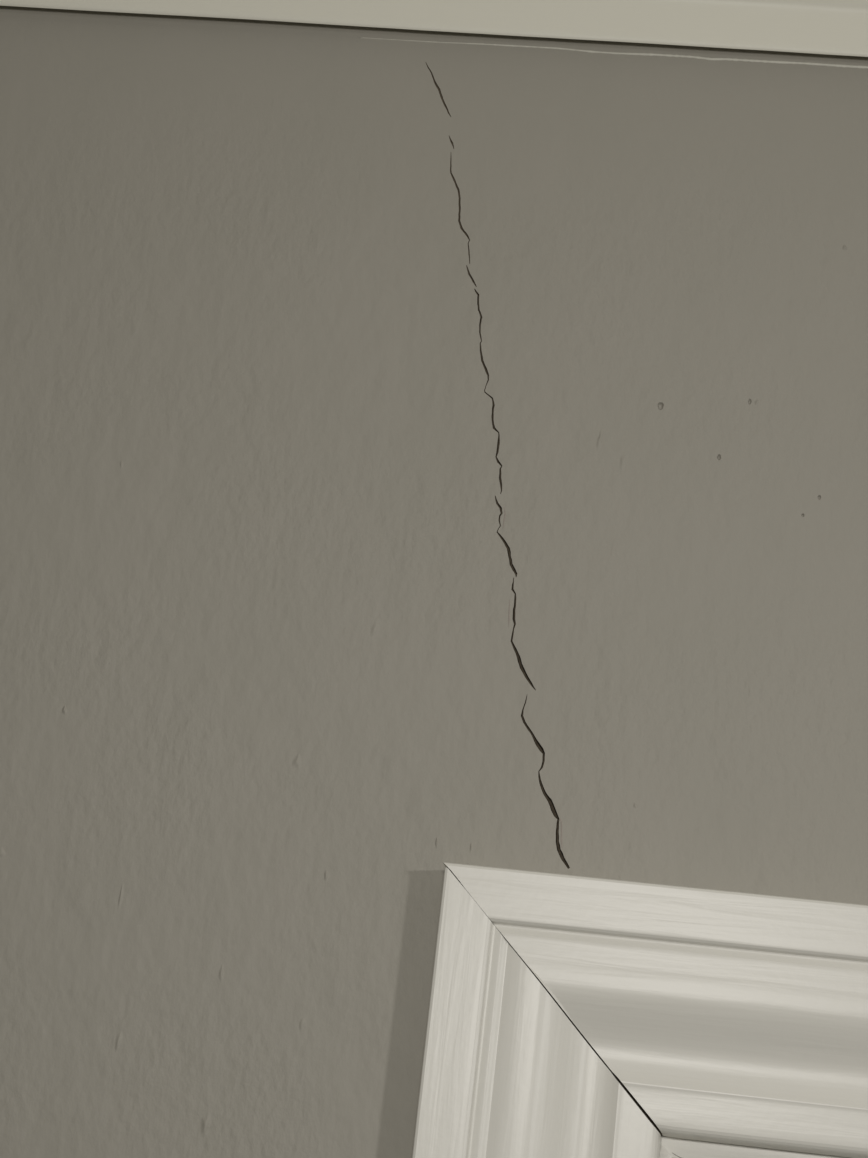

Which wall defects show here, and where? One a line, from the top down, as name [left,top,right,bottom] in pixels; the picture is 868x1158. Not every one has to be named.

crack [426,63,570,869]